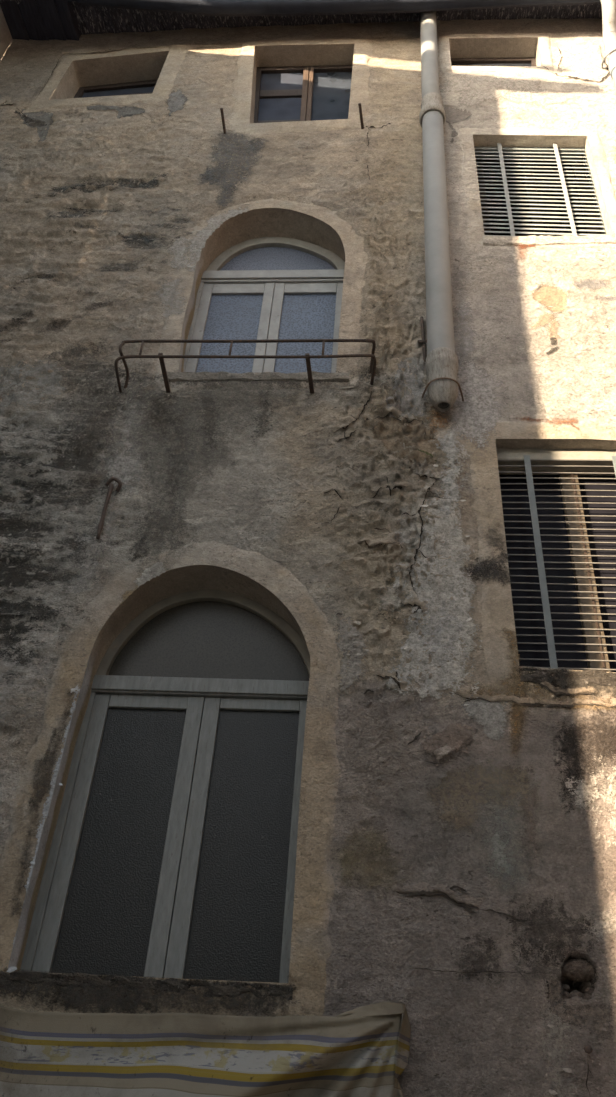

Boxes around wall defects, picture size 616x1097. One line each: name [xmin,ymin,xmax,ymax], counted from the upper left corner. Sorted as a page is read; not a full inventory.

crack [545,46,610,83]
water stain [201,133,269,206]
crack [331,387,426,442]
water stain [0,348,376,682]
crack [323,467,450,613]
crack [364,669,412,694]
crack [450,679,616,713]
water stain [470,630,616,850]
crack [395,882,532,922]
water stain [502,897,616,965]
water stain [0,967,296,1016]